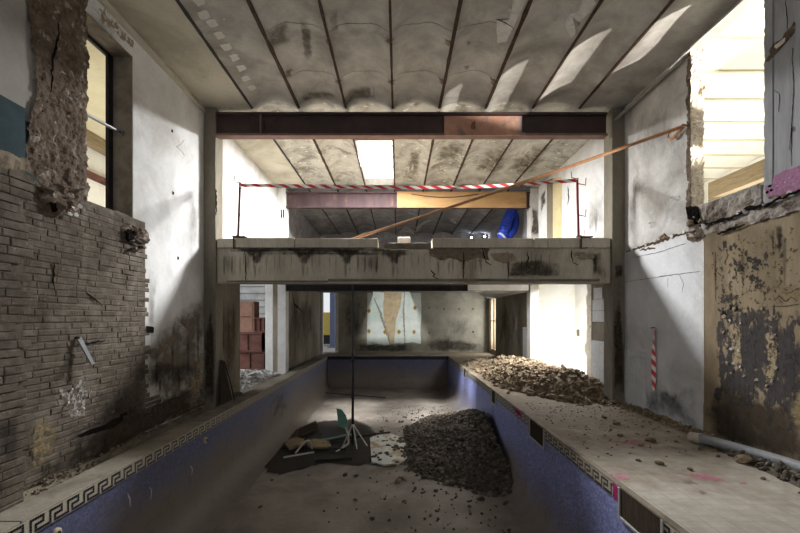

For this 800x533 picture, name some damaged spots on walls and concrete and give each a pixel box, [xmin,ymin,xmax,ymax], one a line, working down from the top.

crack [50,22,60,92]
spalling [670,0,800,251]
flaking render [0,0,161,492]
damp [238,248,407,263]
crack [463,248,529,279]
damp [510,261,557,276]
damp [60,379,95,417]
damp [71,305,214,463]
peeling [729,318,742,371]
damp [707,227,800,459]
peeling [763,326,778,392]